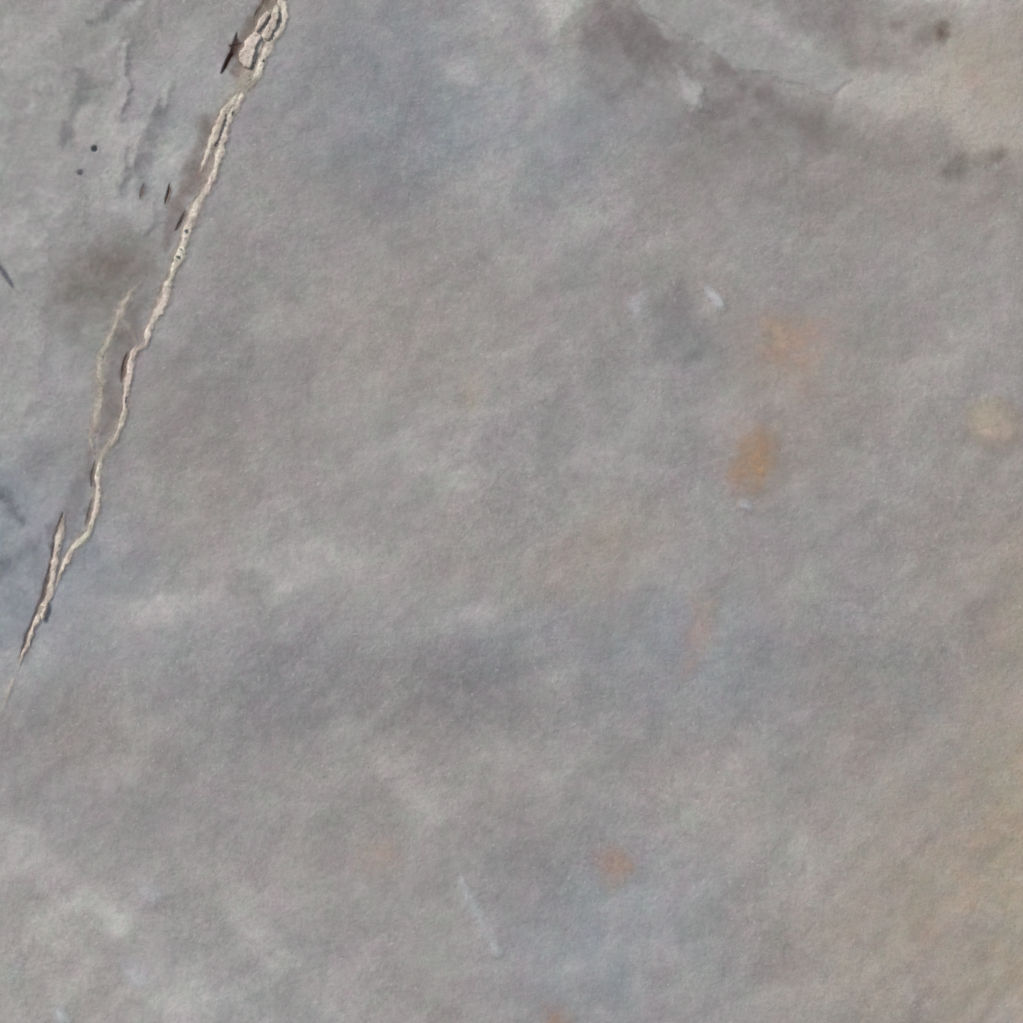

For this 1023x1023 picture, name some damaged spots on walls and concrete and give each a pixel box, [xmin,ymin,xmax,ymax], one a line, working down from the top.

crack [19,0,288,662]